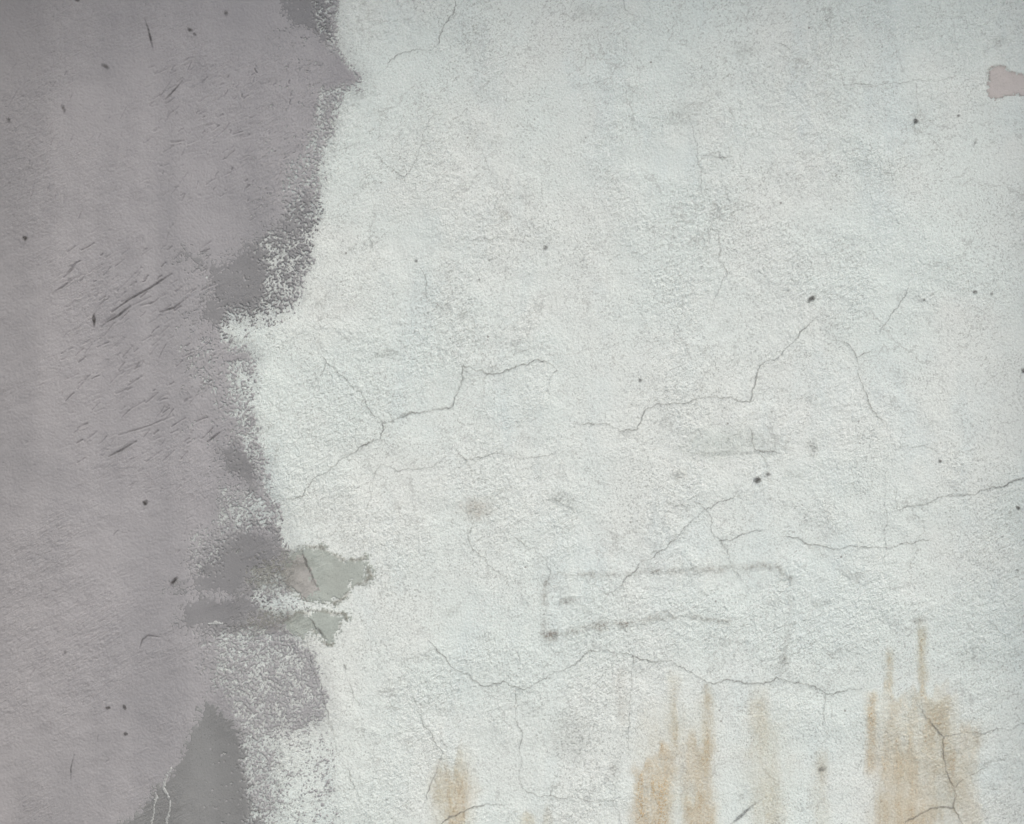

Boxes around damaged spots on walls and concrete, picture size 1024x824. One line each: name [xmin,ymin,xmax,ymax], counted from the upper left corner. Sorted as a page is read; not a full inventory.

peeling [987,65,1024,101]
spalling [247,542,377,647]
peeling [150,767,172,824]
crack [909,724,959,820]